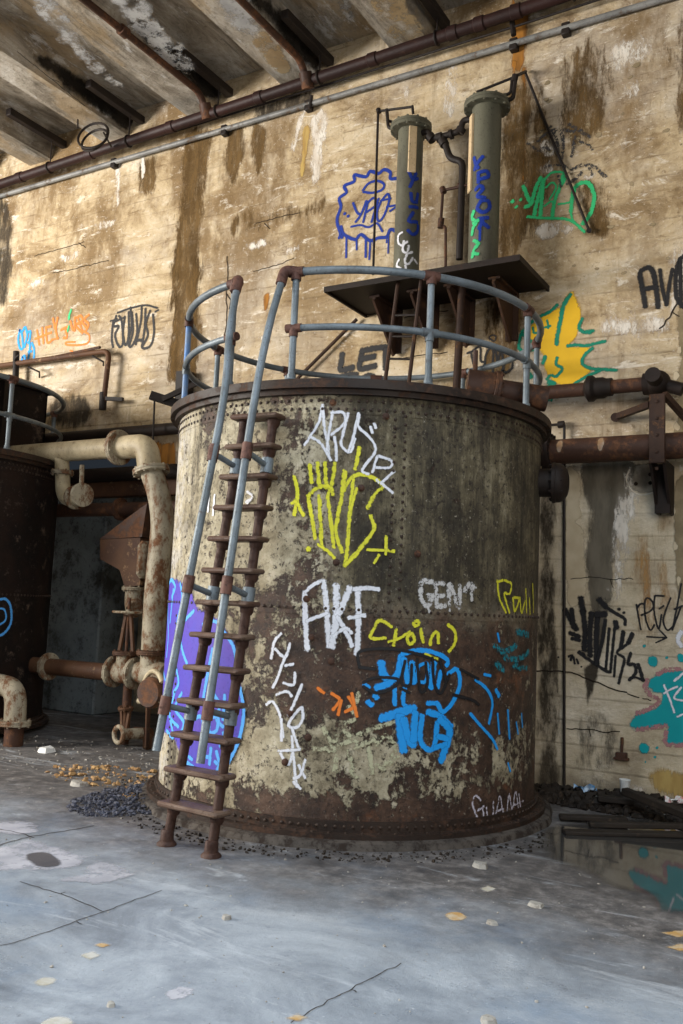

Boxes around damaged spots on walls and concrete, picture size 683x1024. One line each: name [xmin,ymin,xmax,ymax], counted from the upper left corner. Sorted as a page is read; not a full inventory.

water stain [224,91,327,184]
water stain [499,84,549,257]
water stain [561,38,652,146]
water stain [0,199,12,305]
water stain [167,127,212,383]
rust [156,441,176,464]
water stain [581,461,636,645]
water stain [0,821,132,884]
crack [3,881,162,945]
crack [290,963,401,1023]